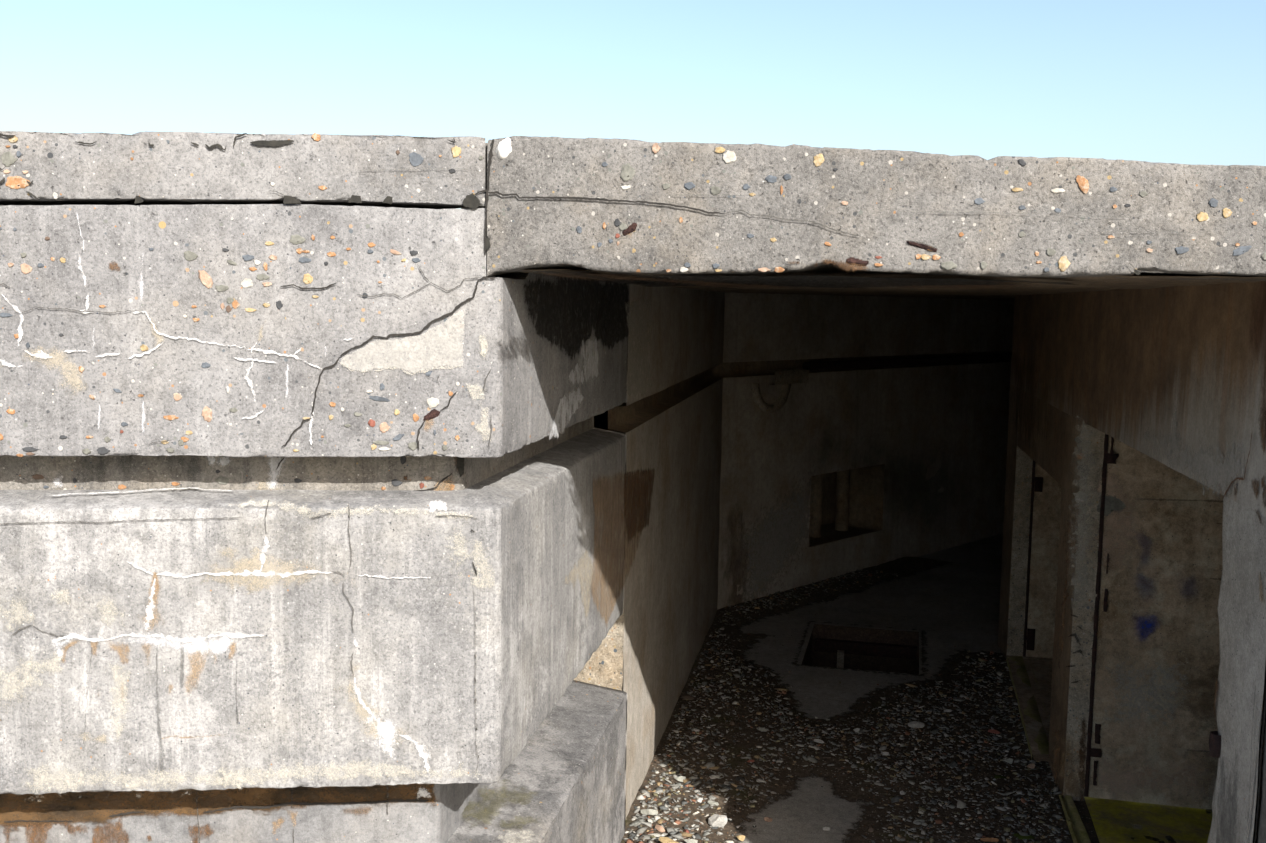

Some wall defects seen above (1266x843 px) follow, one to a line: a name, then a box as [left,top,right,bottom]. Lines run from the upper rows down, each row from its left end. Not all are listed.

crack [488,191,860,236]
crack [0,283,140,314]
crack [276,264,496,470]
peeling [340,311,464,375]
spalling [423,409,440,421]
peeling [469,370,492,448]
crack [416,473,452,491]
water stain [0,537,333,695]
rust [4,820,128,843]
rust [191,790,212,843]